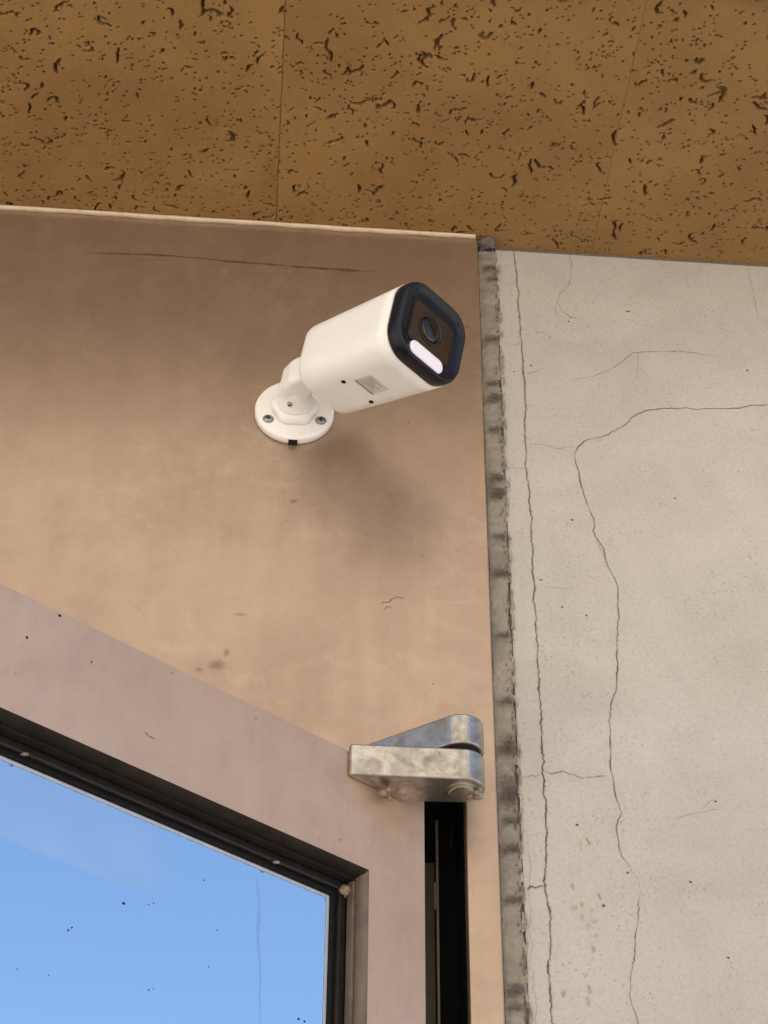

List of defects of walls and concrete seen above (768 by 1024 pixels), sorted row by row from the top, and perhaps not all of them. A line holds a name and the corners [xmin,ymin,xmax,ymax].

crack [513,251,768,1024]